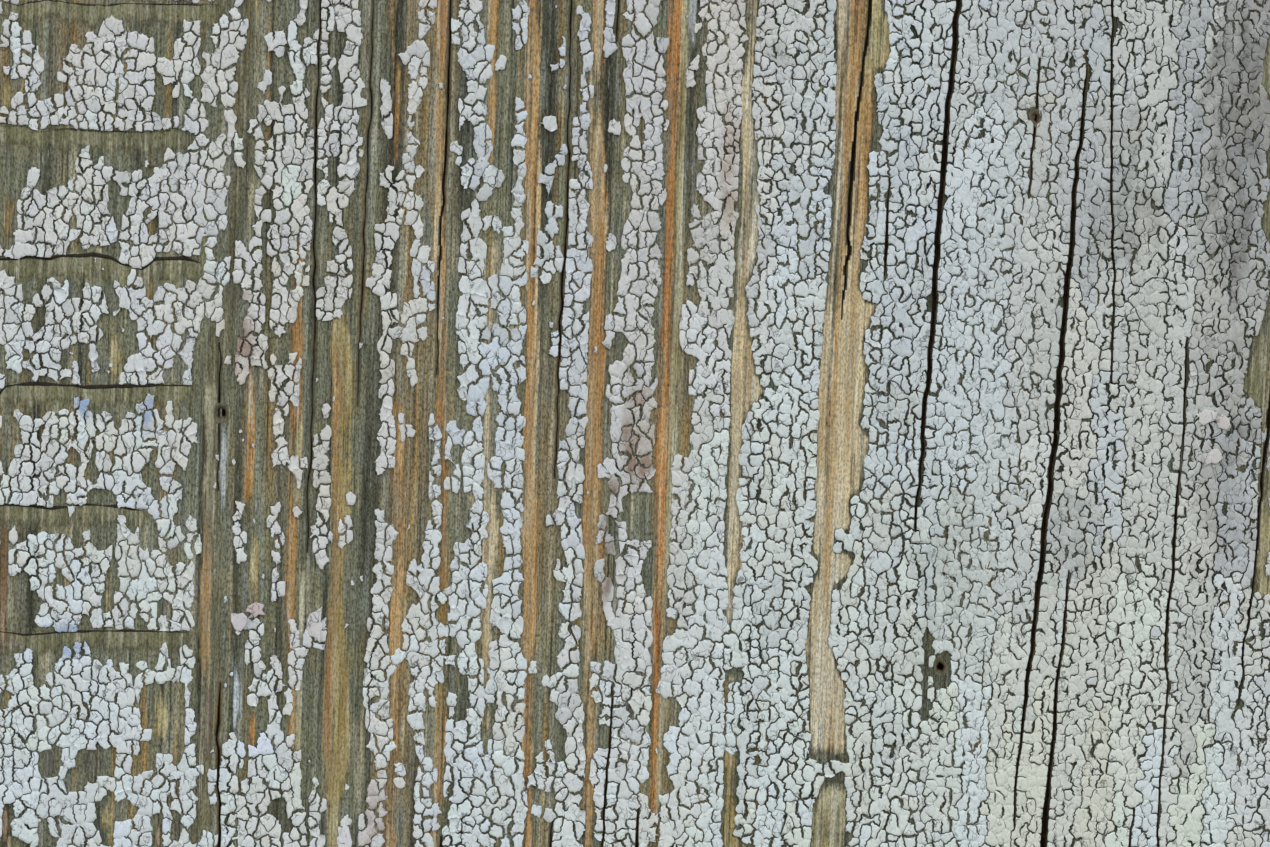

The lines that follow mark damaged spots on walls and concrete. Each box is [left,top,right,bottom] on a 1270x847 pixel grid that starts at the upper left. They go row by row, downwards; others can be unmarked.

crack [0,628,187,636]
peeling [0,0,367,847]
peeling [337,0,1270,847]
crack [840,0,873,320]
crack [882,177,892,277]
crack [912,0,962,532]
crack [1013,0,1117,847]
crack [1236,379,1270,706]